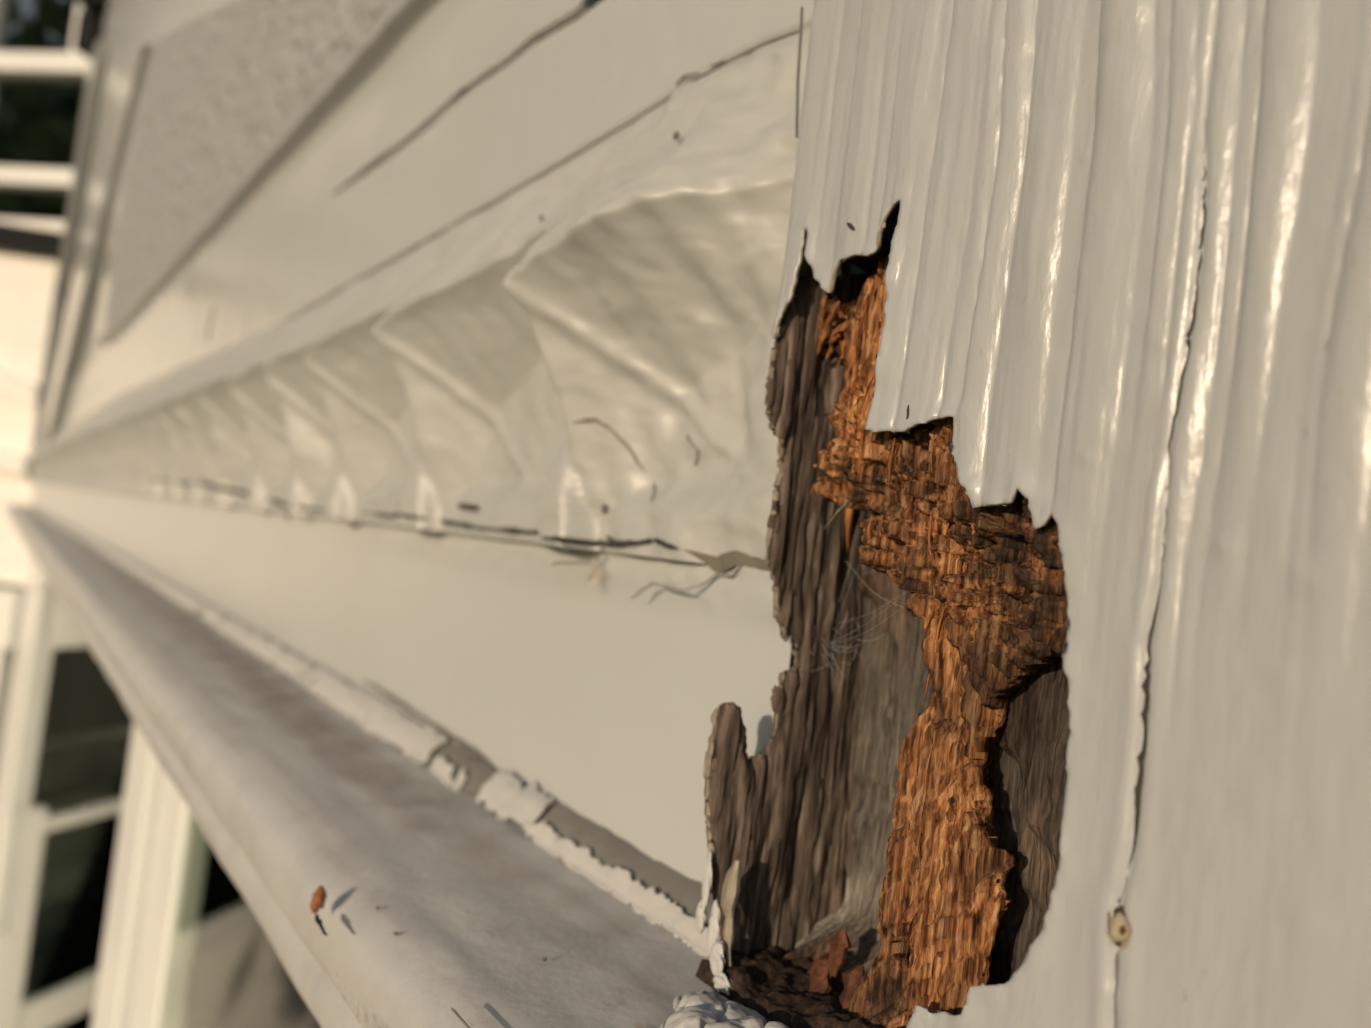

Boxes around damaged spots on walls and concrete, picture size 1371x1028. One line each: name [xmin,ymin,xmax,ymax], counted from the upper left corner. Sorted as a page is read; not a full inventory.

crack [1107,122,1207,1028]